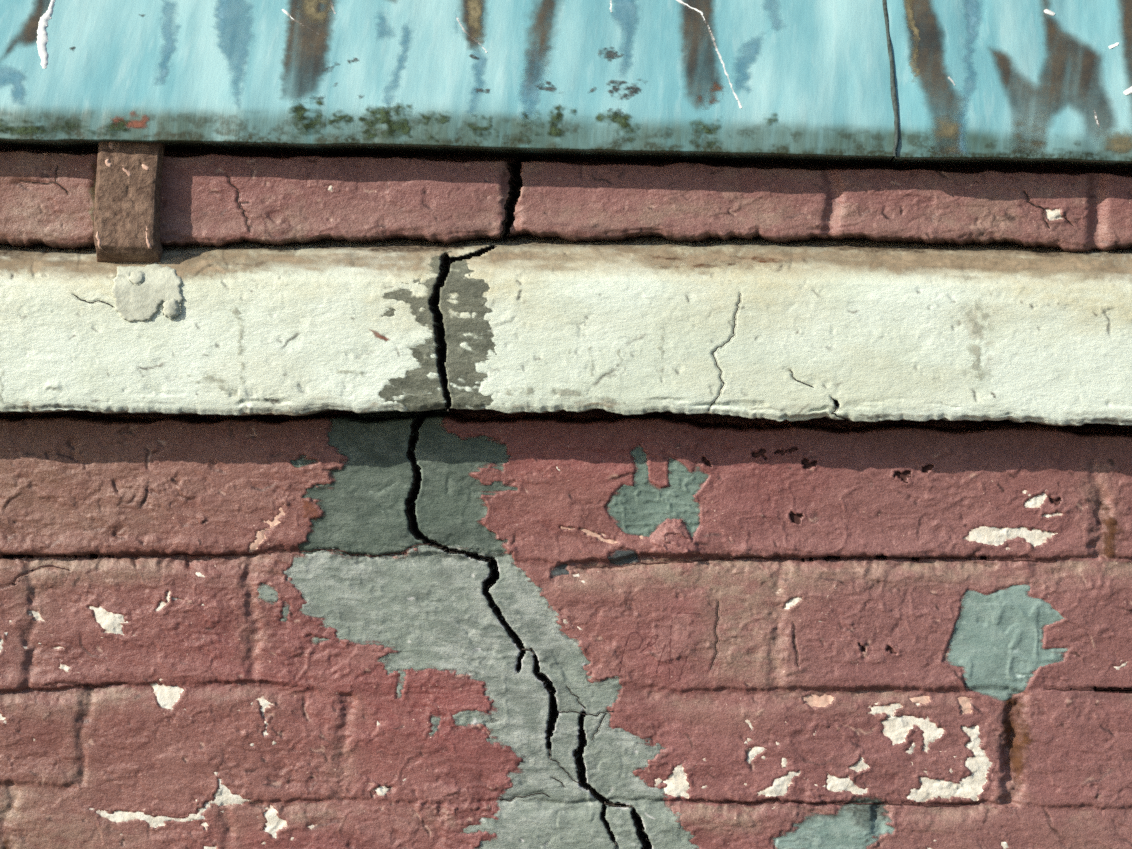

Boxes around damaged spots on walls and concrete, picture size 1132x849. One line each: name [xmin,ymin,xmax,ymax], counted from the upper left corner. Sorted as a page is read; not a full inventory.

corrosion [304,0,330,20]
corrosion [468,0,481,30]
corrosion [905,0,919,76]
corrosion [113,113,148,128]
crack [0,158,651,849]
peeling [257,251,711,849]
spalling [894,465,933,483]
peeling [963,490,1062,550]
peeling [802,694,834,708]
peeling [868,584,1068,802]
peeling [89,772,251,835]
peeling [773,757,894,849]